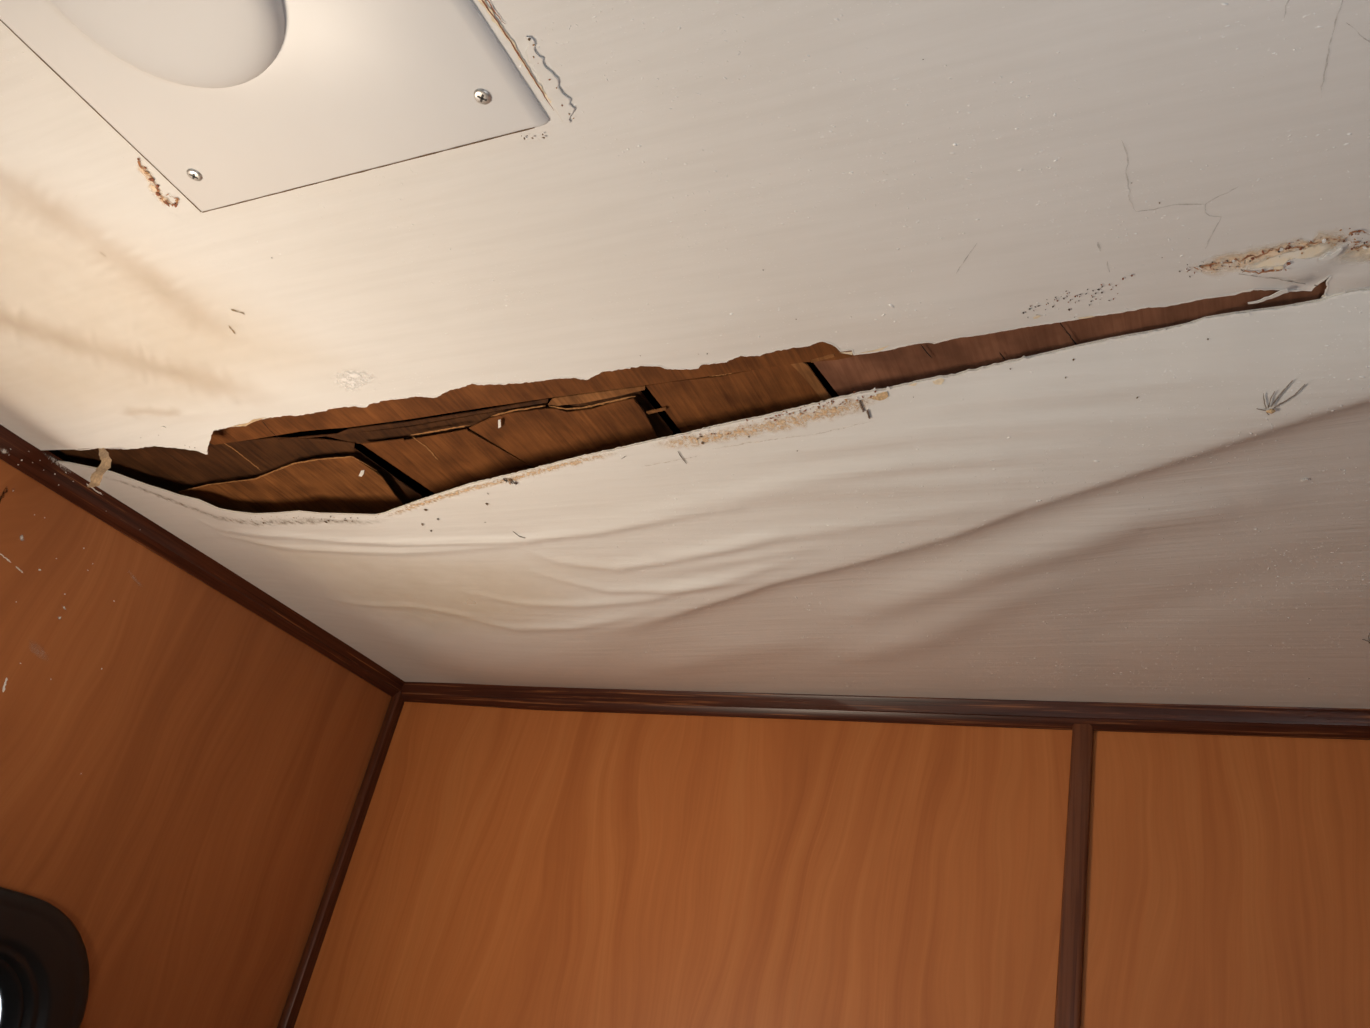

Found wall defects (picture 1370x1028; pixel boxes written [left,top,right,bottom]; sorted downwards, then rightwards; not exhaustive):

peeling [1185,228,1370,297]